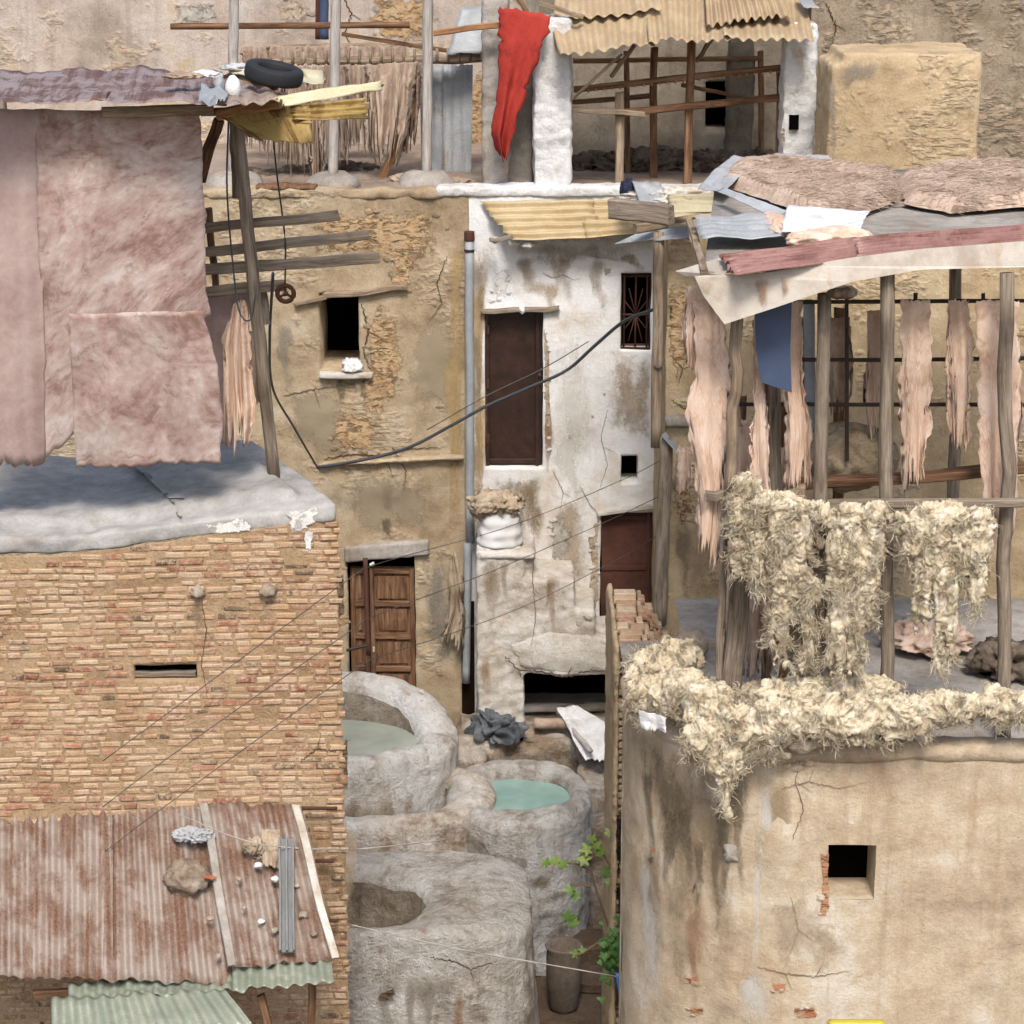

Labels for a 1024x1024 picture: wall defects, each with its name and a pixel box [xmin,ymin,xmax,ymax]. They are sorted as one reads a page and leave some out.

spalling [314,207,449,292]
crack [427,257,447,324]
spalling [328,305,403,454]
damp [618,366,648,423]
crack [553,410,613,512]
damp [561,507,580,575]
crack [201,598,212,696]
damp [644,762,746,895]
crack [783,761,867,839]
spalling [817,850,830,916]